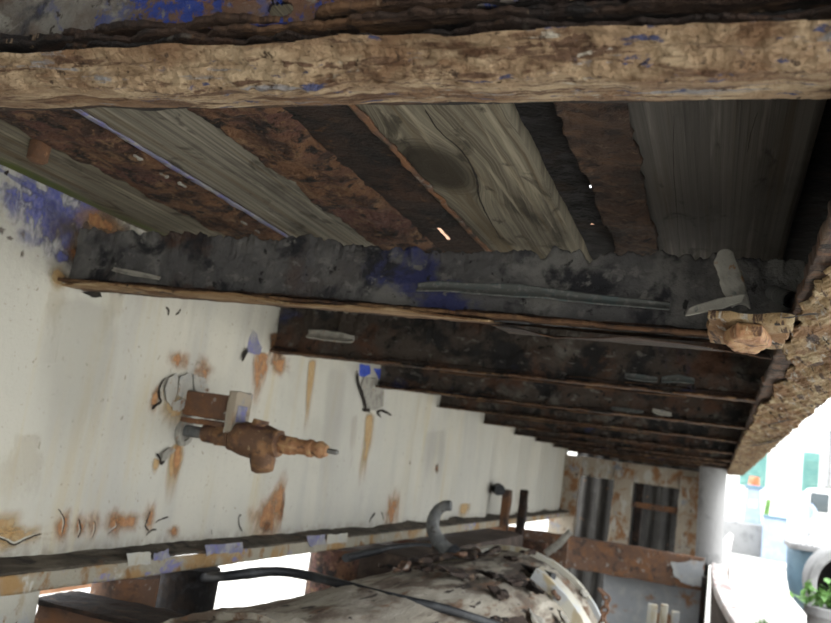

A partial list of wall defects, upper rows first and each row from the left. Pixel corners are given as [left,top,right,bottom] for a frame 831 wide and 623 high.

peeling [0,168,100,262]
peeling [357,364,392,417]
corrosion [169,444,183,478]
corrosion [363,414,373,462]
corrosion [255,484,285,532]